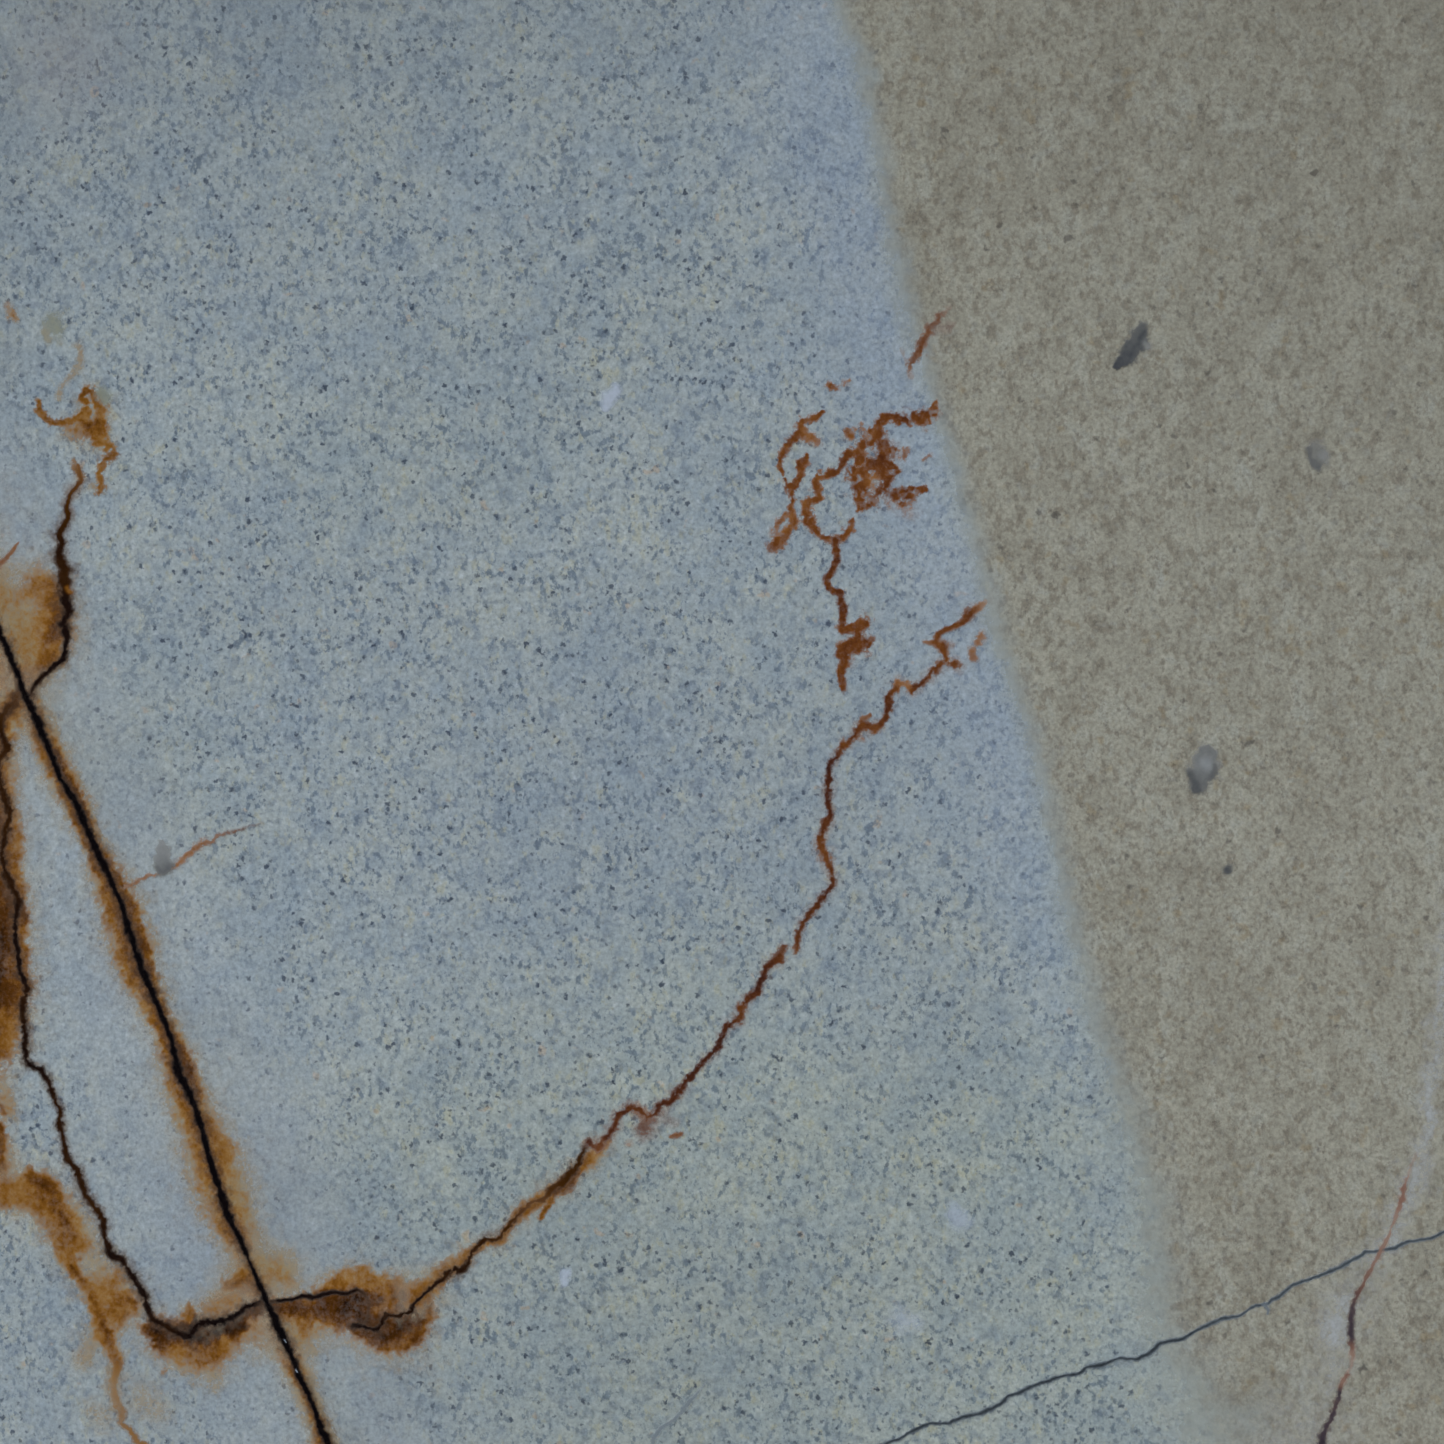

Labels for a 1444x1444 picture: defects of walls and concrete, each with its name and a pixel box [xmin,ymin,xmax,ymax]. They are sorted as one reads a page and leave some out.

rust [33,345,119,496]
rust [766,400,939,692]
rust [906,312,946,372]
water stain [835,0,1444,1444]
rust [0,542,683,1444]
crack [0,464,986,1444]
crack [881,1176,1444,1444]